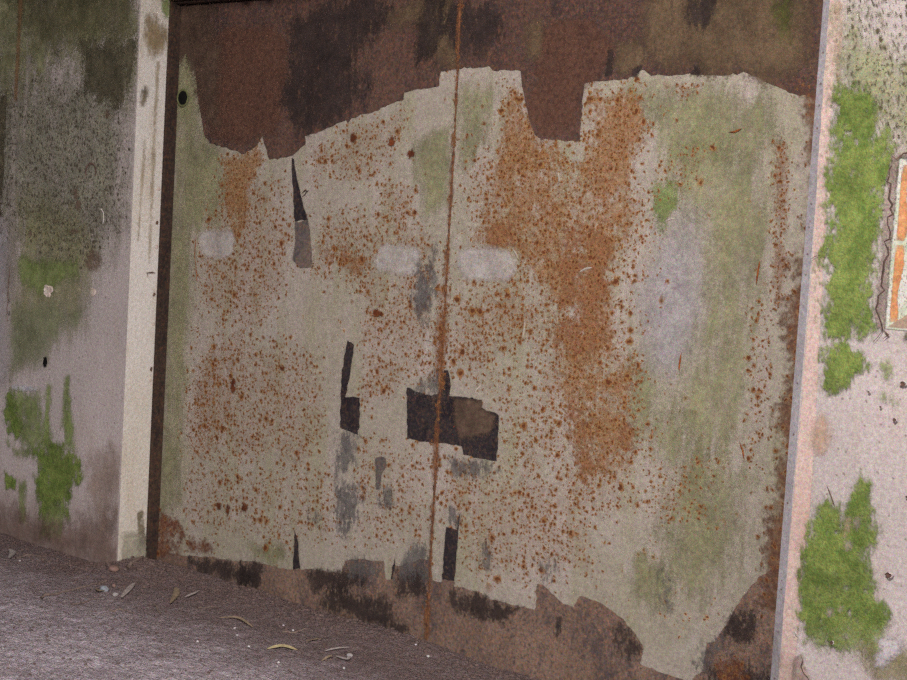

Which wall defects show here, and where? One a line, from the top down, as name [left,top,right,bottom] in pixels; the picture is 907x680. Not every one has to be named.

leakage [144,15,168,55]
leakage [0,39,135,366]
peeling [179,0,823,268]
crack [873,152,907,342]
peeling [340,341,360,434]
rust [157,70,725,639]
peeling [406,370,499,461]
peeling [157,506,778,680]